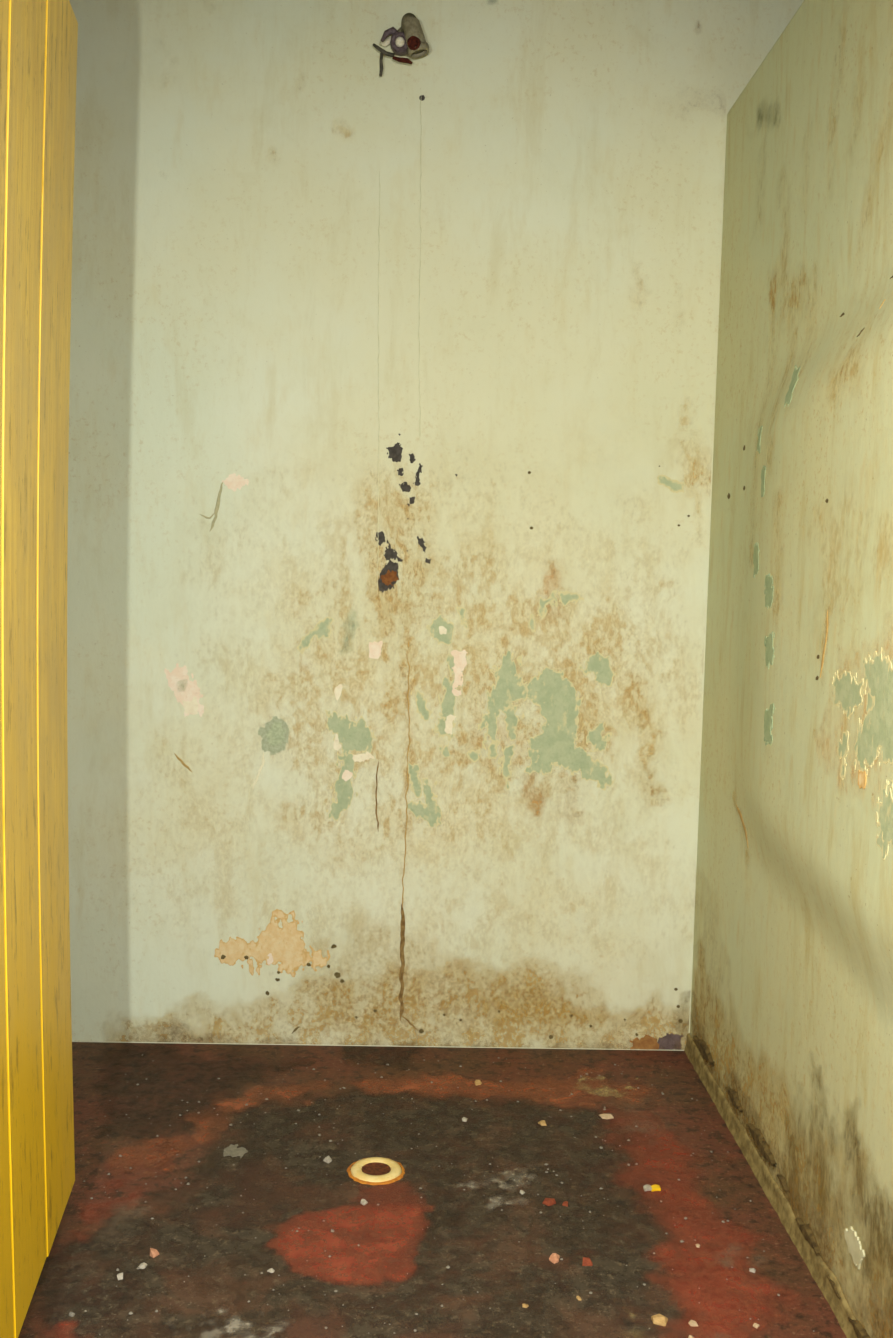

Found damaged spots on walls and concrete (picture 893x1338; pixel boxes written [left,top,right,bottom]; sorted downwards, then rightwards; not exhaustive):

flaking render [386,434,422,519]
flaking render [375,531,431,593]
flaking render [252,716,289,788]
peeling [325,684,377,822]
peeling [369,641,383,659]
peeling [407,763,442,828]
peeling [411,607,468,758]
peeling [467,650,616,791]
peeling [816,647,893,860]
peeling [214,909,344,995]
leakage [38,969,694,1338]
leakage [640,965,843,1270]